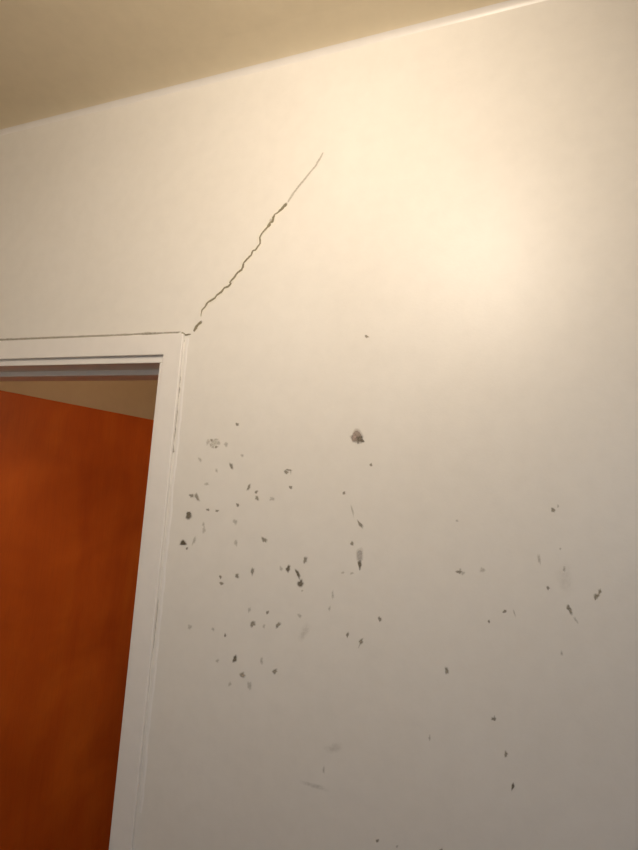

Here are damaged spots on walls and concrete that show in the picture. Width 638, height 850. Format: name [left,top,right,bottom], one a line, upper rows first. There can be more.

crack [0,202,289,341]